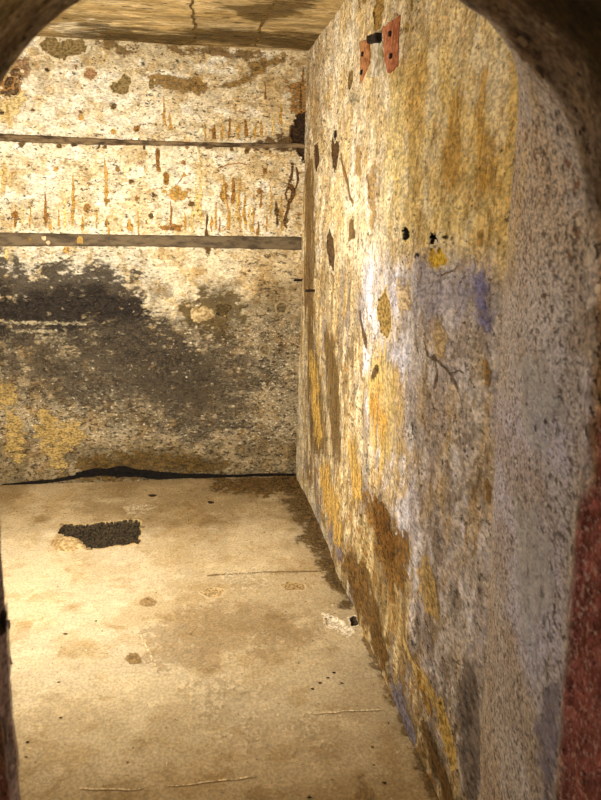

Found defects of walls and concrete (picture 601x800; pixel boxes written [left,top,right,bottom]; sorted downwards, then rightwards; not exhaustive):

crack [189,0,197,41]
rust [11,203,31,228]
rust [44,104,289,236]
damp [0,160,363,609]
crack [423,340,464,416]
damp [416,516,444,625]
damp [361,631,439,800]